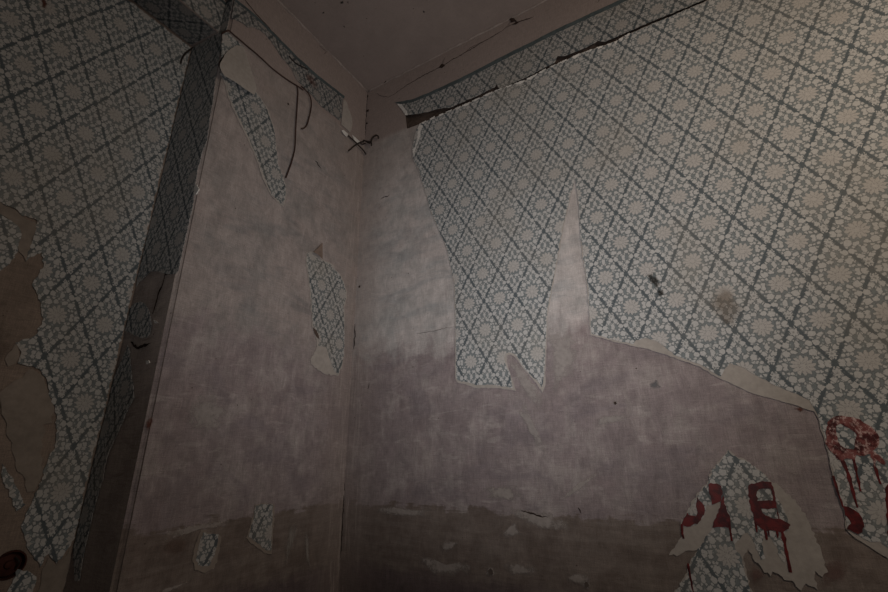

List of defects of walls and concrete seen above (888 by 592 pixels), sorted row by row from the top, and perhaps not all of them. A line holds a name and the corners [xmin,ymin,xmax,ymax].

crack [365,17,532,133]